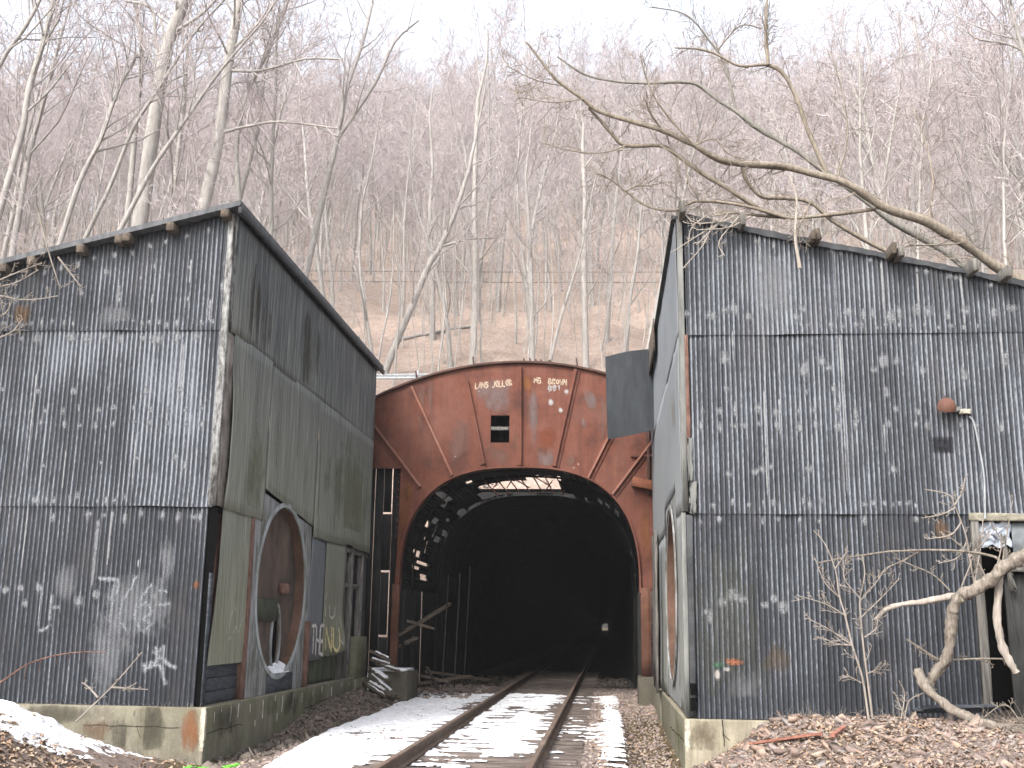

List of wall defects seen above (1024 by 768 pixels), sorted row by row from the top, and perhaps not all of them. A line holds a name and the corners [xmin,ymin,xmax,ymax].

water stain [303,318,319,377]
rust [183,715,198,745]